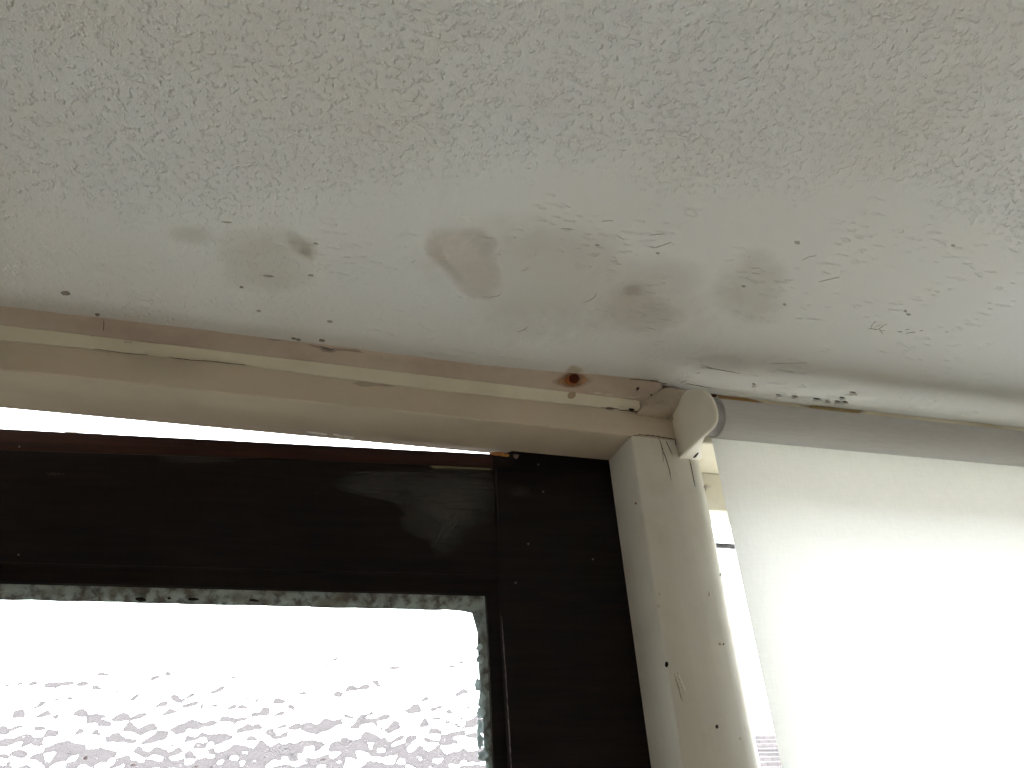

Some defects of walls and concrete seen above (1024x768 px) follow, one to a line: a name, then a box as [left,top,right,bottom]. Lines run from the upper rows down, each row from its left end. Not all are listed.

corrosion [559,374,587,386]